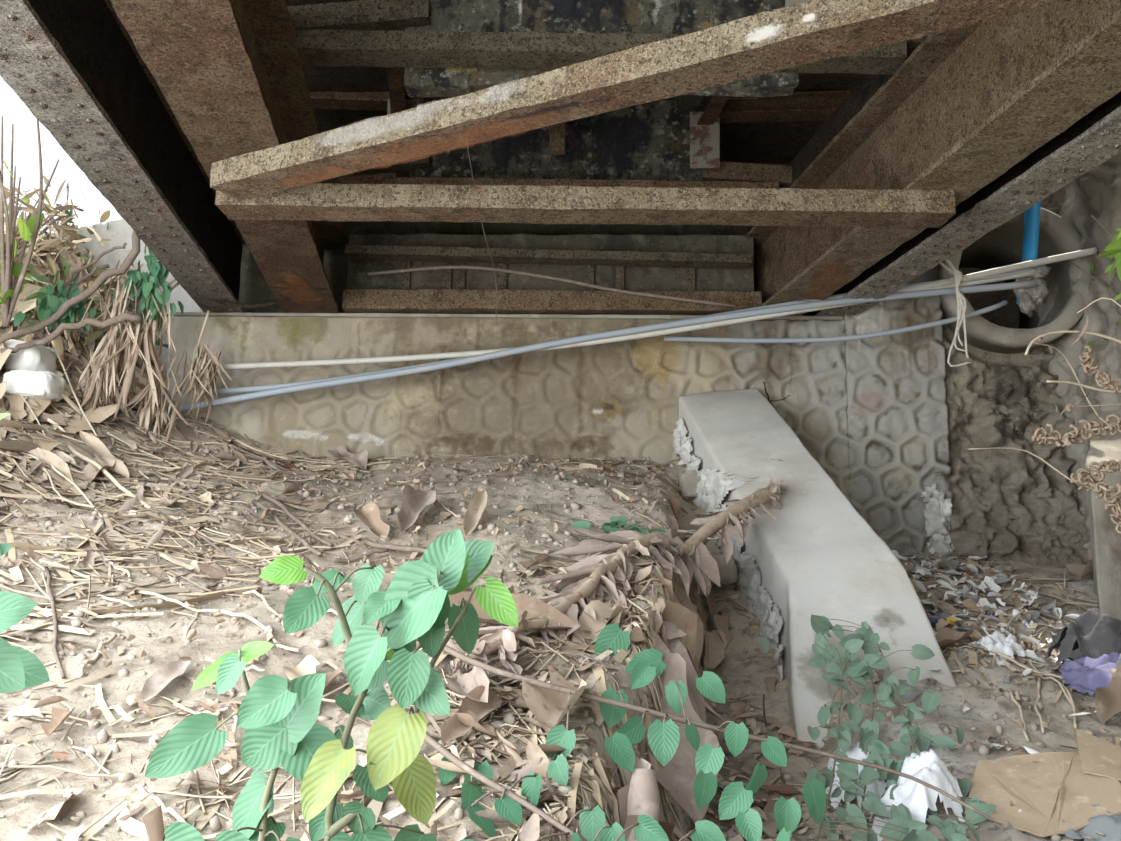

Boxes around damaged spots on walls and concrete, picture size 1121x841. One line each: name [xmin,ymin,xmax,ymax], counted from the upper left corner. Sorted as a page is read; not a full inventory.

damp [739,0,753,17]
damp [489,98,652,178]
flaking render [673,417,755,518]
flaking render [714,528,784,682]